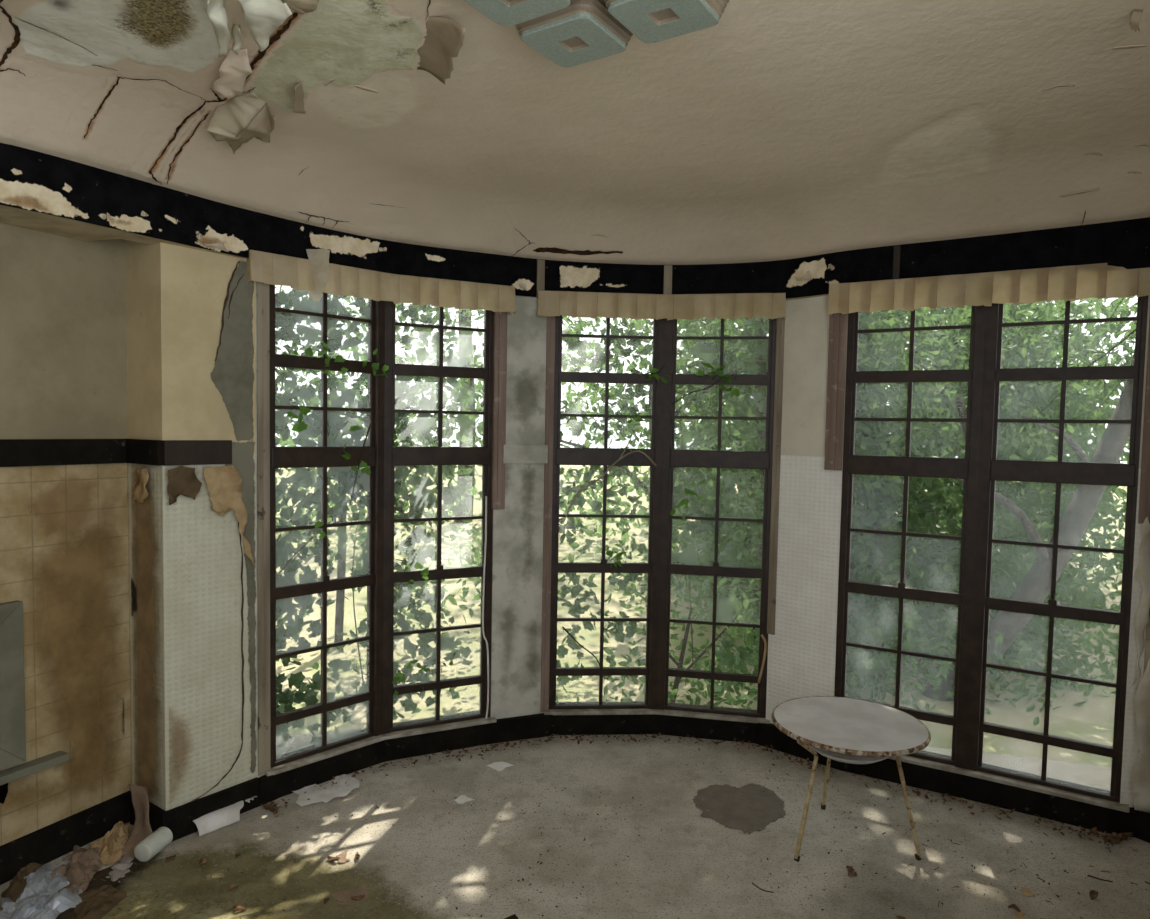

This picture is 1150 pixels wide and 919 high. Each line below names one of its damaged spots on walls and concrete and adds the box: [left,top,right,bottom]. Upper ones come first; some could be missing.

mould [116,0,193,45]
crack [0,0,298,185]
peeling [0,0,466,154]
peeling [0,168,178,233]
peeling [512,279,534,291]
peeling [559,265,625,288]
peeling [786,258,839,288]
peeling [182,225,257,806]
water stain [35,467,158,798]
water stain [0,790,43,809]